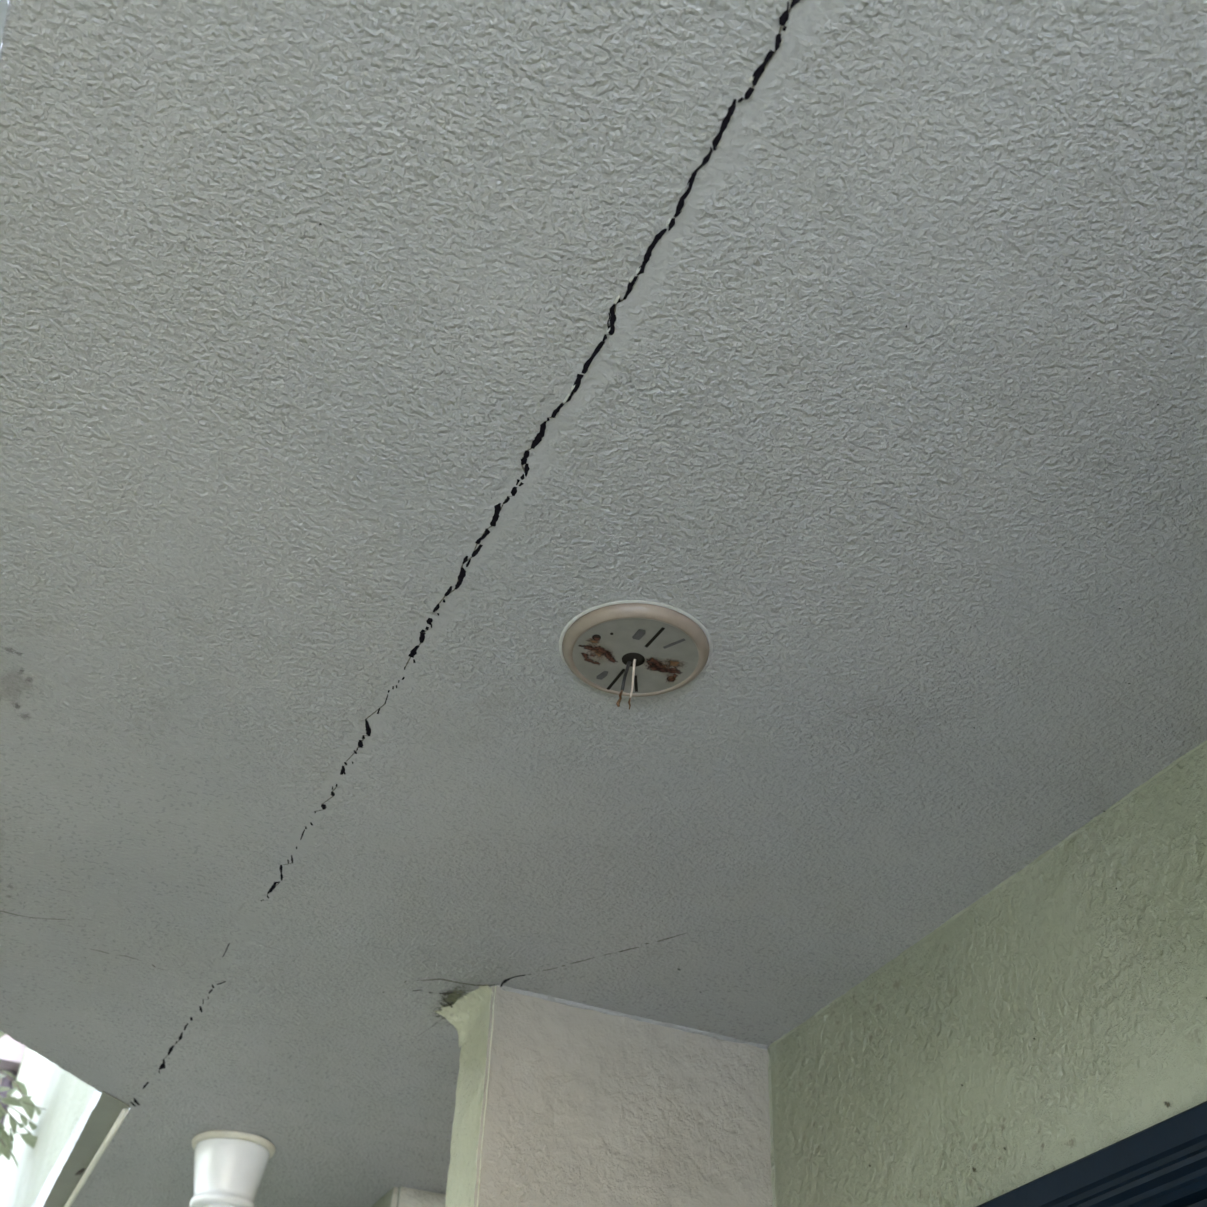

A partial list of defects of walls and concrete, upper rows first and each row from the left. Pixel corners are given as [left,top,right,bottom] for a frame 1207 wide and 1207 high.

crack [261,0,800,901]
crack [130,944,230,1107]
crack [500,933,686,987]